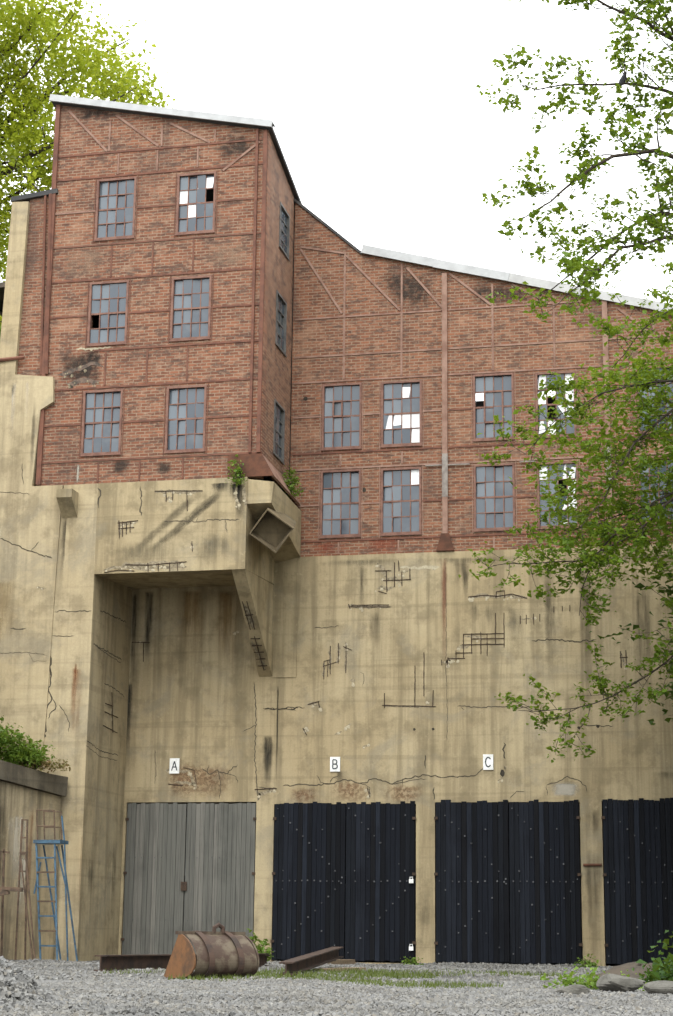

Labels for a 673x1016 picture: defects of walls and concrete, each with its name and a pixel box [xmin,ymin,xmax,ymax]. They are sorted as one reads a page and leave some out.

crack [1,610,125,761]
crack [202,684,506,799]
crack [445,569,530,738]
crack [510,776,587,798]